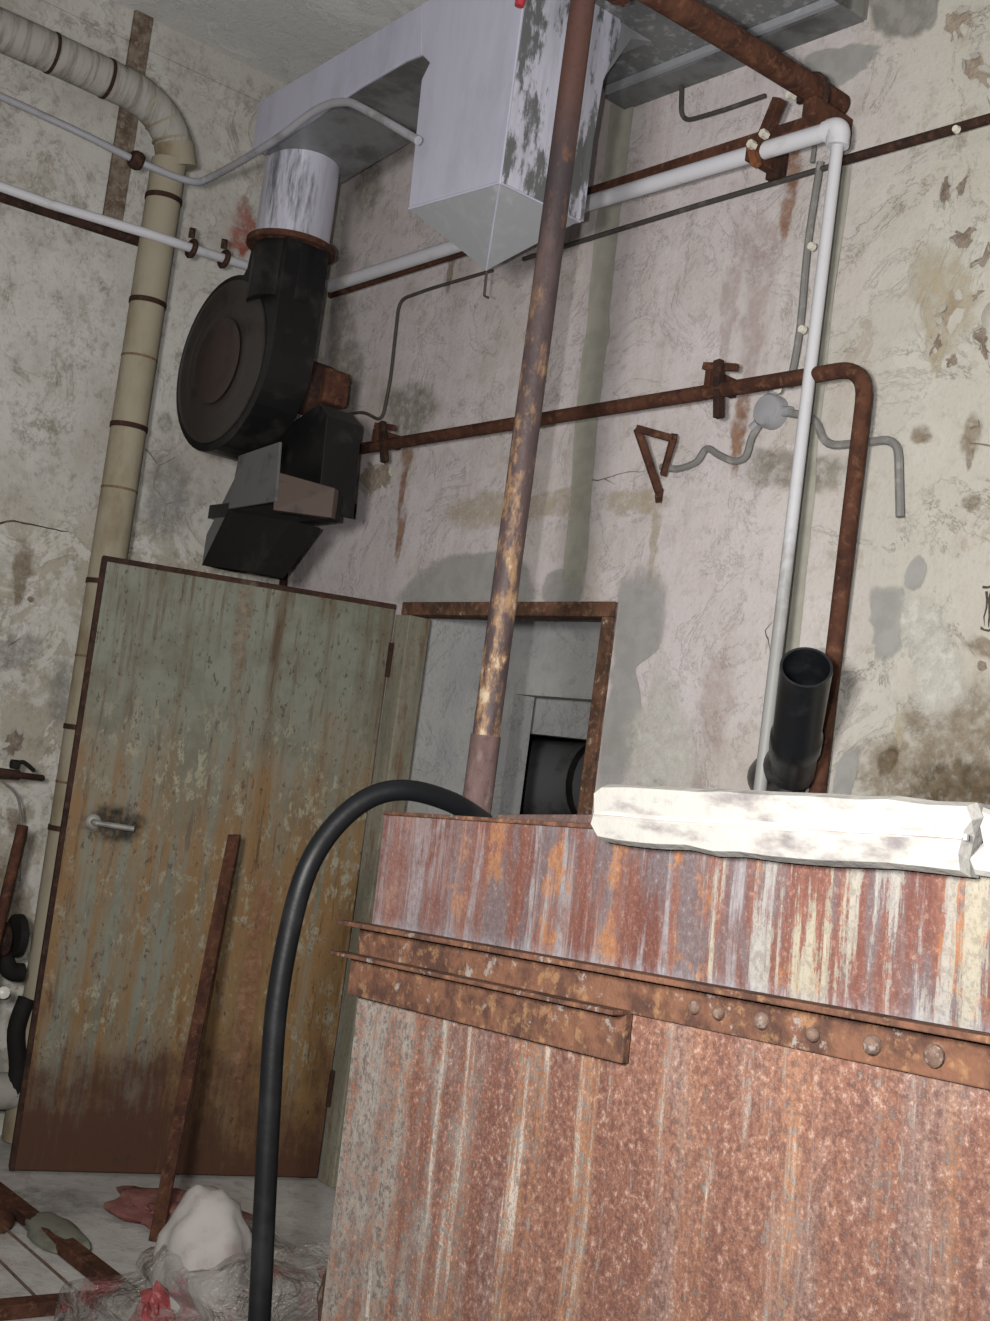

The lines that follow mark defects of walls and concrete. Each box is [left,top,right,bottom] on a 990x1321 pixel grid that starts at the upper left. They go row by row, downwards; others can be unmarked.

crack [0,520,68,532]
damp [871,598,990,804]